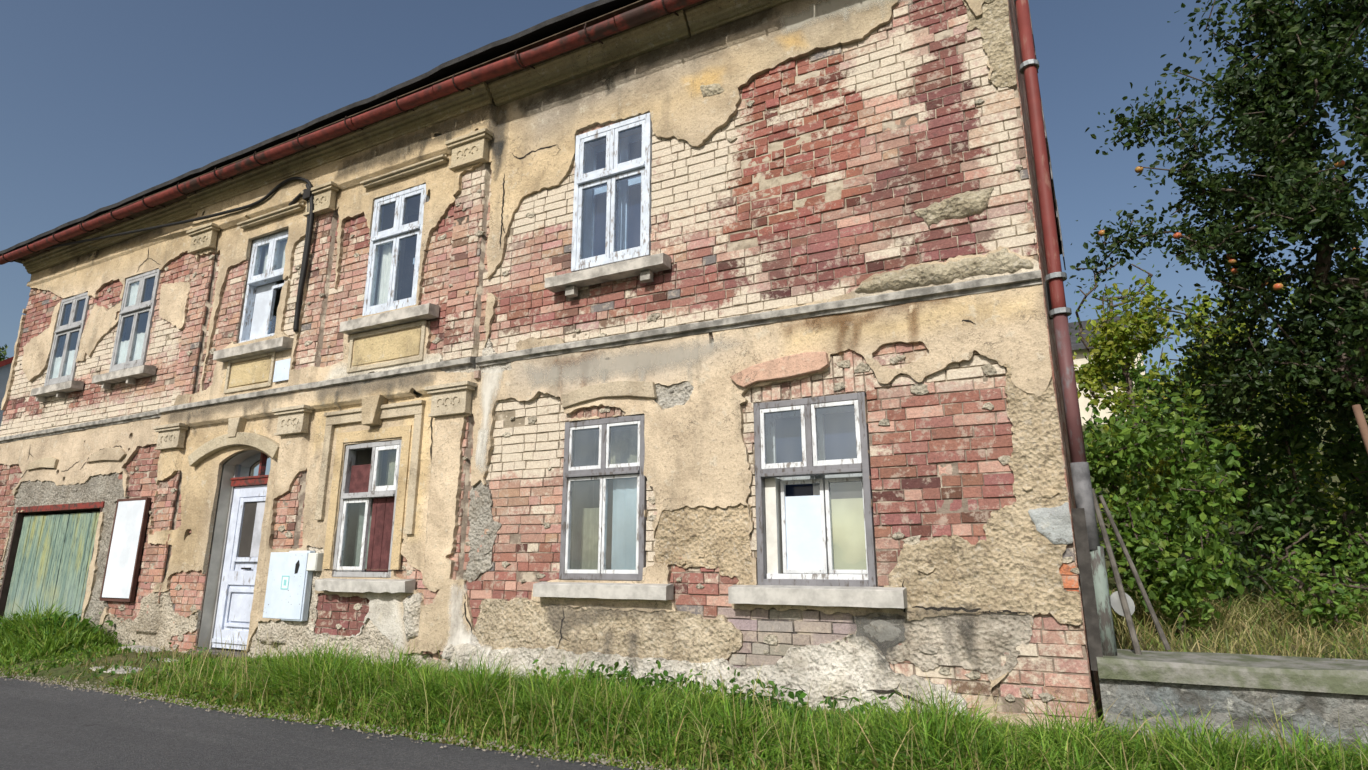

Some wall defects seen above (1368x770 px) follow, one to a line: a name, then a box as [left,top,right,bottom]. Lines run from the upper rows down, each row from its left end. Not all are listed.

peeling [420,0,1040,379]
peeling [0,246,251,437]
peeling [284,210,371,370]
flaking render [0,444,210,653]
peeling [272,471,324,553]
flaking render [248,571,450,672]
peeling [396,539,438,605]
peeling [449,342,1095,722]